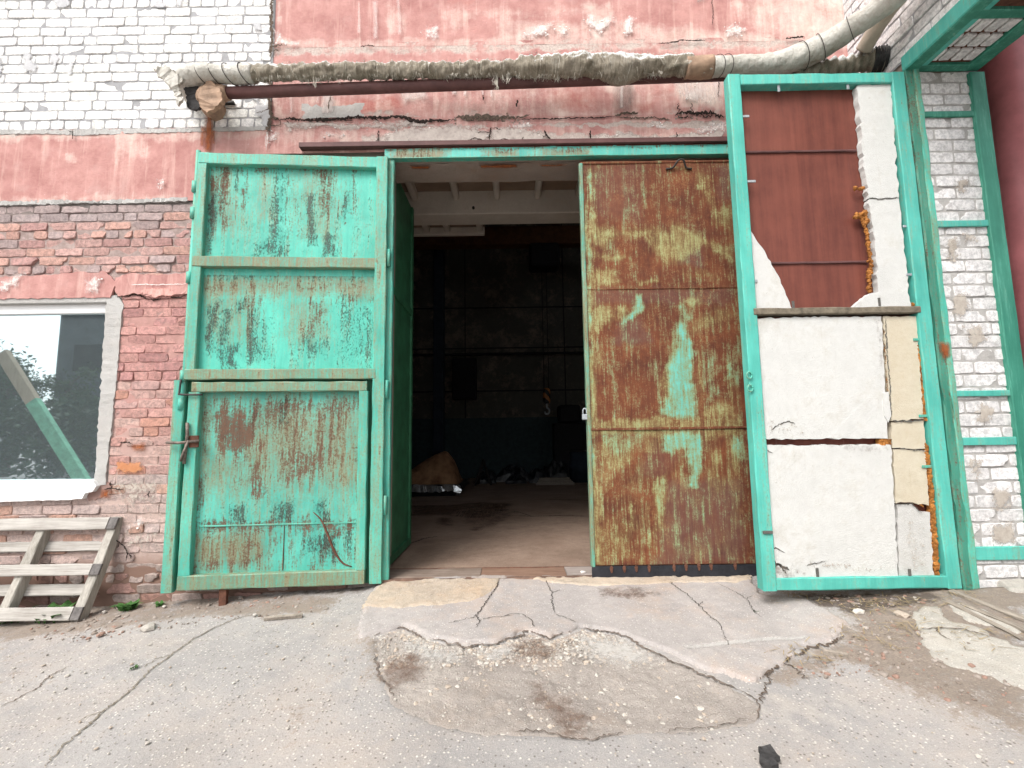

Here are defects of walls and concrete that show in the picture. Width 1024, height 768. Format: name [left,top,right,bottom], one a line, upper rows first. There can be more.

corrosion [201,117,214,151]
crack [256,0,724,141]
crack [454,580,574,628]
crack [45,614,258,767]